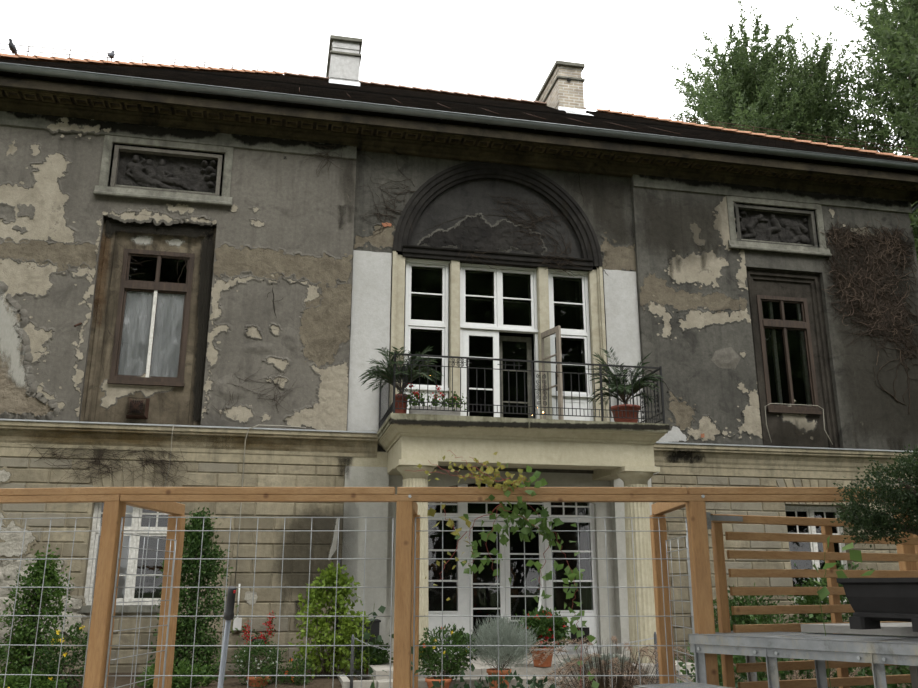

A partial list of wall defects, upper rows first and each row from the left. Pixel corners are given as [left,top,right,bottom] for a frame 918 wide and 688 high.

peeling [45,117,112,139]
peeling [0,138,217,420]
spalling [201,221,397,431]
spalling [417,213,547,255]
peeling [666,380,762,443]
spalling [0,509,87,656]